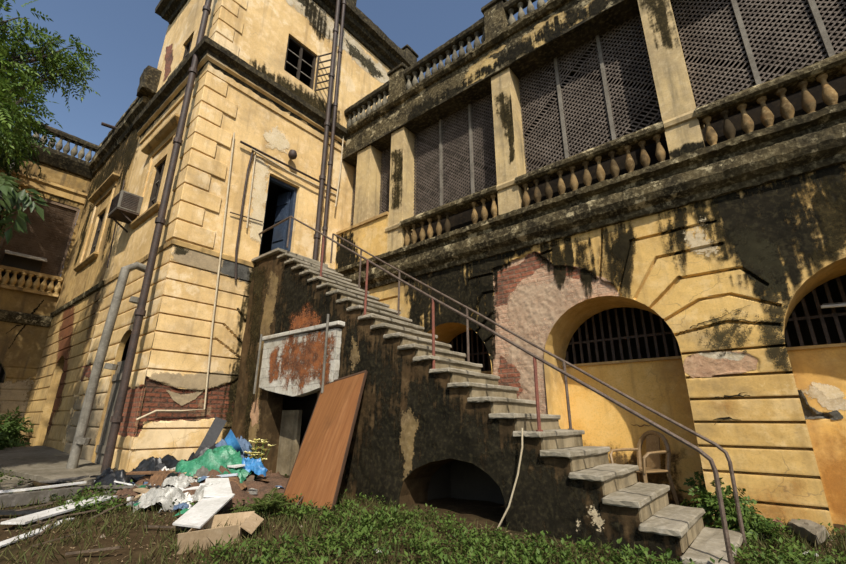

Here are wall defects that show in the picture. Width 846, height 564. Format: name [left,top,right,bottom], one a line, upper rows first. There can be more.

flaking render [163,44,173,82]
leakage [286,0,389,83]
leakage [640,0,678,48]
leakage [658,163,846,374]
crack [6,300,44,349]
flaking render [118,376,234,437]
leakage [220,263,268,442]
rust [268,303,334,394]
leakage [274,265,684,564]
flaking render [492,252,619,414]
spalling [683,350,758,379]
peeling [797,382,846,420]